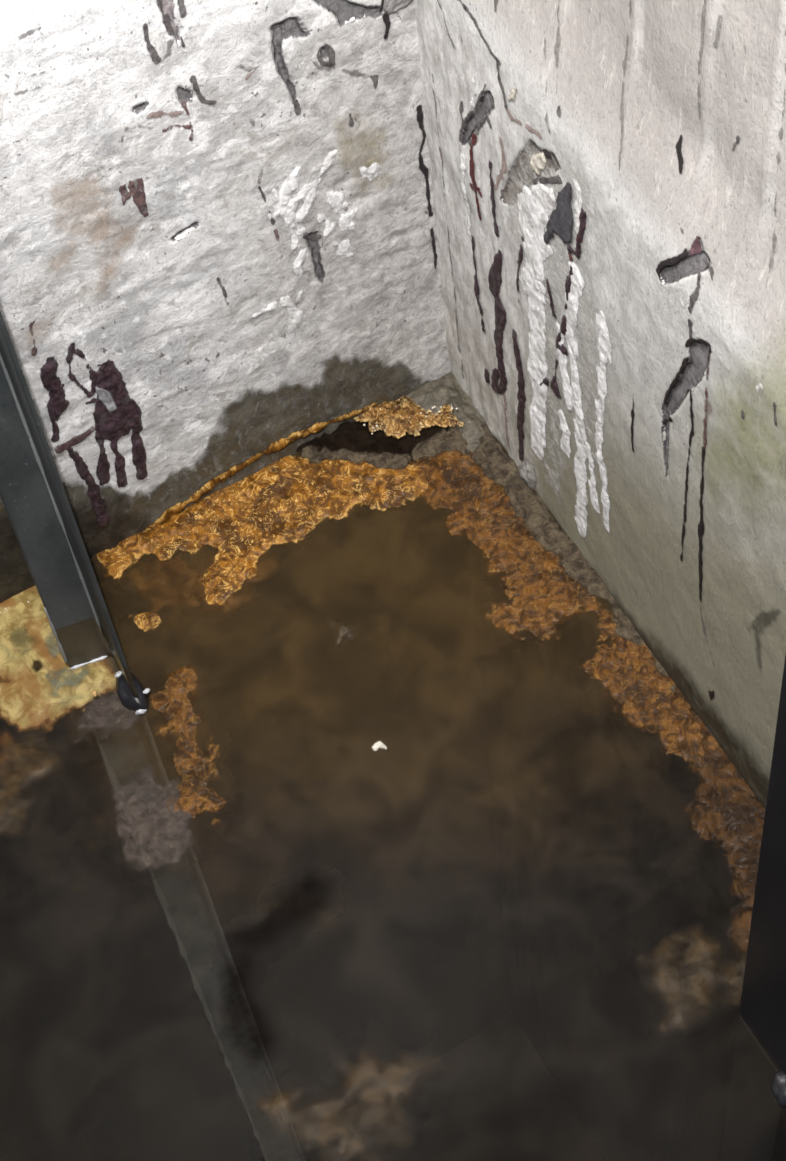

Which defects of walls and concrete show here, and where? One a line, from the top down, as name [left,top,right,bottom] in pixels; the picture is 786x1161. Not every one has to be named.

spalling [271,17,310,115]
crack [437,0,561,139]
crack [416,75,464,378]
rust [460,133,482,236]
spalling [500,142,587,355]
spalling [656,236,714,285]
rust [29,321,148,527]
leakage [63,355,429,559]
rust [133,403,377,536]
leakage [494,137,612,538]
spalling [661,337,710,477]
leakage [0,498,35,603]